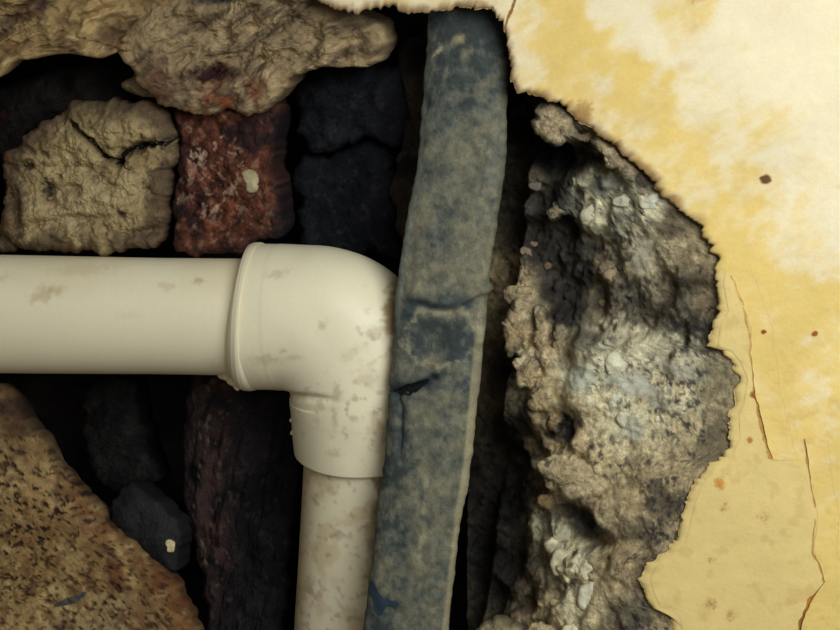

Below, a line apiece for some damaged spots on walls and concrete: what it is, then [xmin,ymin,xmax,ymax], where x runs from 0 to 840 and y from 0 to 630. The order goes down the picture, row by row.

crack [72,124,180,170]
spalling [242,169,259,193]
flaking render [466,61,840,630]
crack [731,276,773,460]
crack [798,447,825,630]